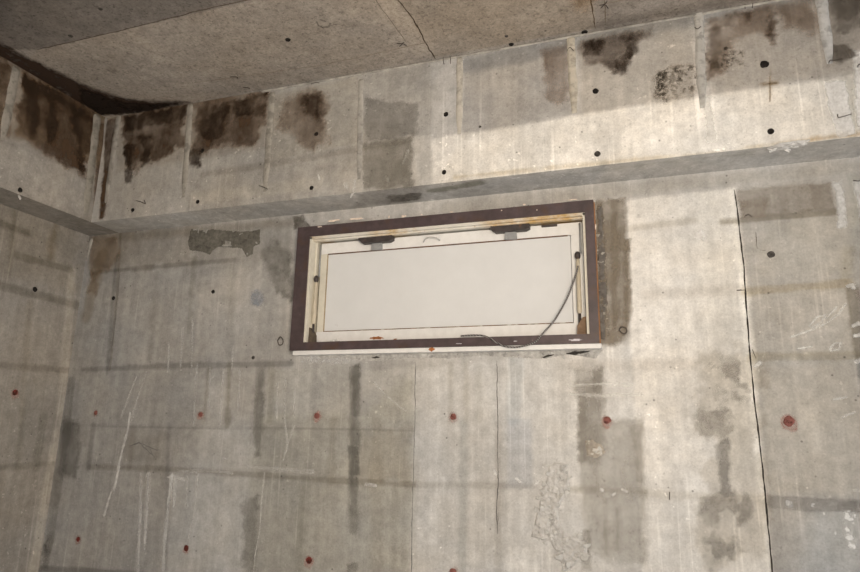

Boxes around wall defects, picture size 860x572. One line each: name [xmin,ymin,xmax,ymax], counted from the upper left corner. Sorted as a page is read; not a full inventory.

water stain [585,34,641,73]
water stain [656,66,696,96]
water stain [17,72,269,182]
water stain [300,94,326,140]
peeling [188,227,260,257]
spalling [531,462,591,572]